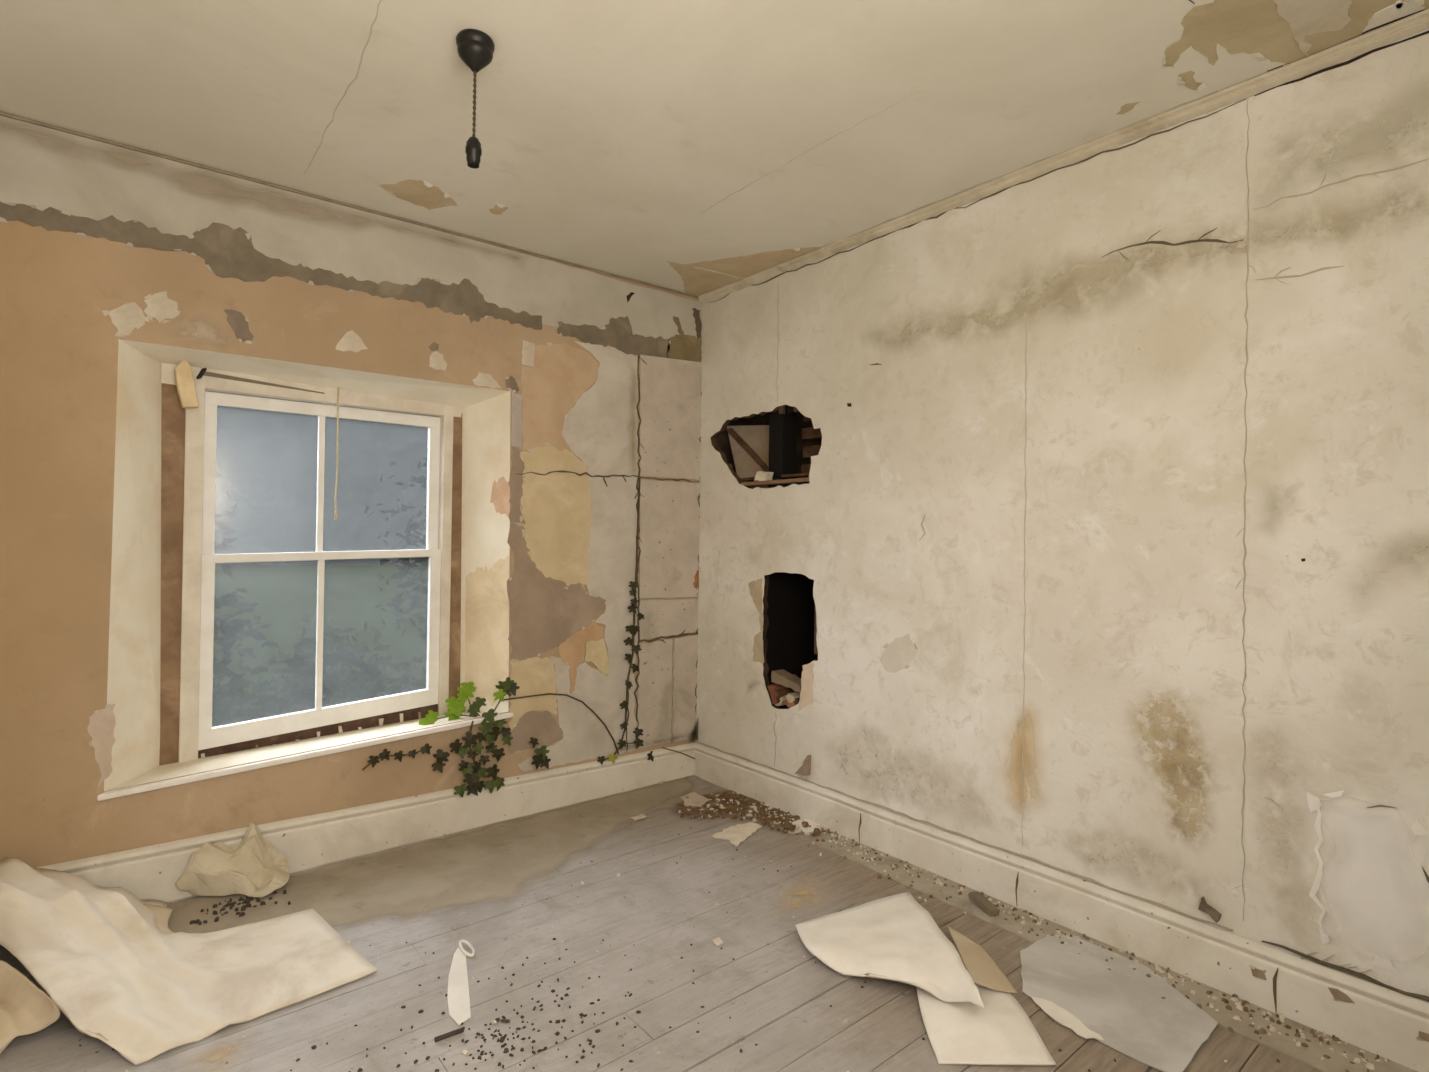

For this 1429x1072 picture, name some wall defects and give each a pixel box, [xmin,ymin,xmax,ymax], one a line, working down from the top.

crack [305,0,382,173]
peeling [1162,0,1429,91]
peeling [380,179,458,210]
peeling [667,247,821,296]
peeling [0,201,702,754]